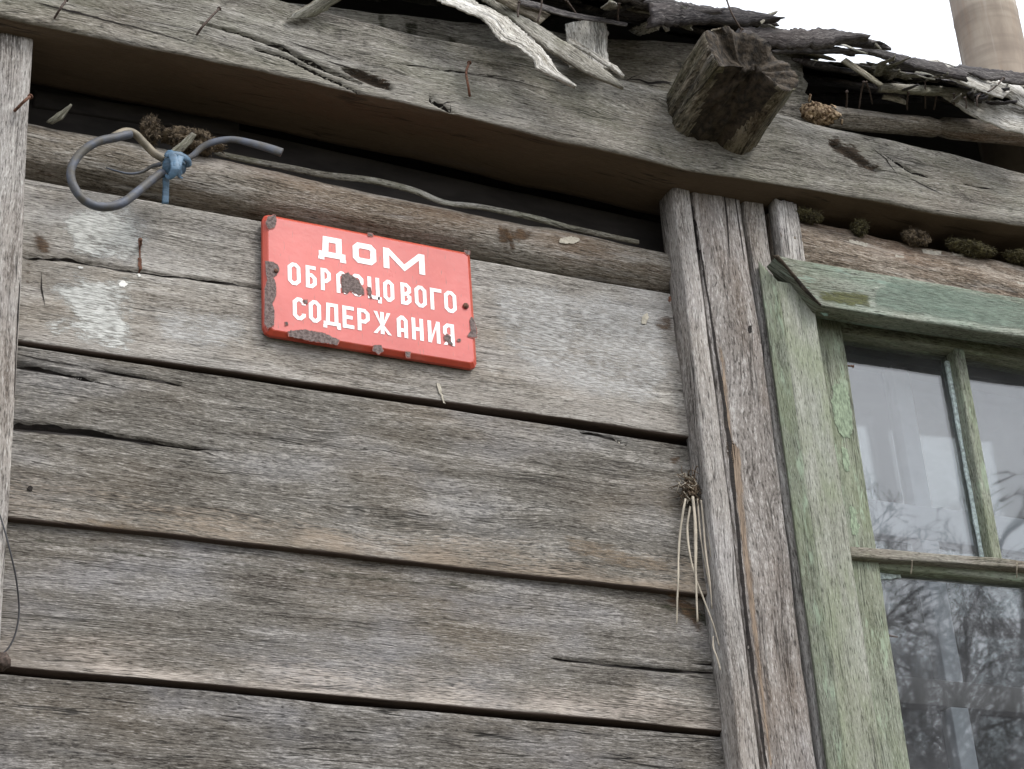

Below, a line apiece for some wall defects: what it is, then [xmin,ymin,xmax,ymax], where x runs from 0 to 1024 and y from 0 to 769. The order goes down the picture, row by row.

crack [13,423,225,458]
crack [549,657,713,674]